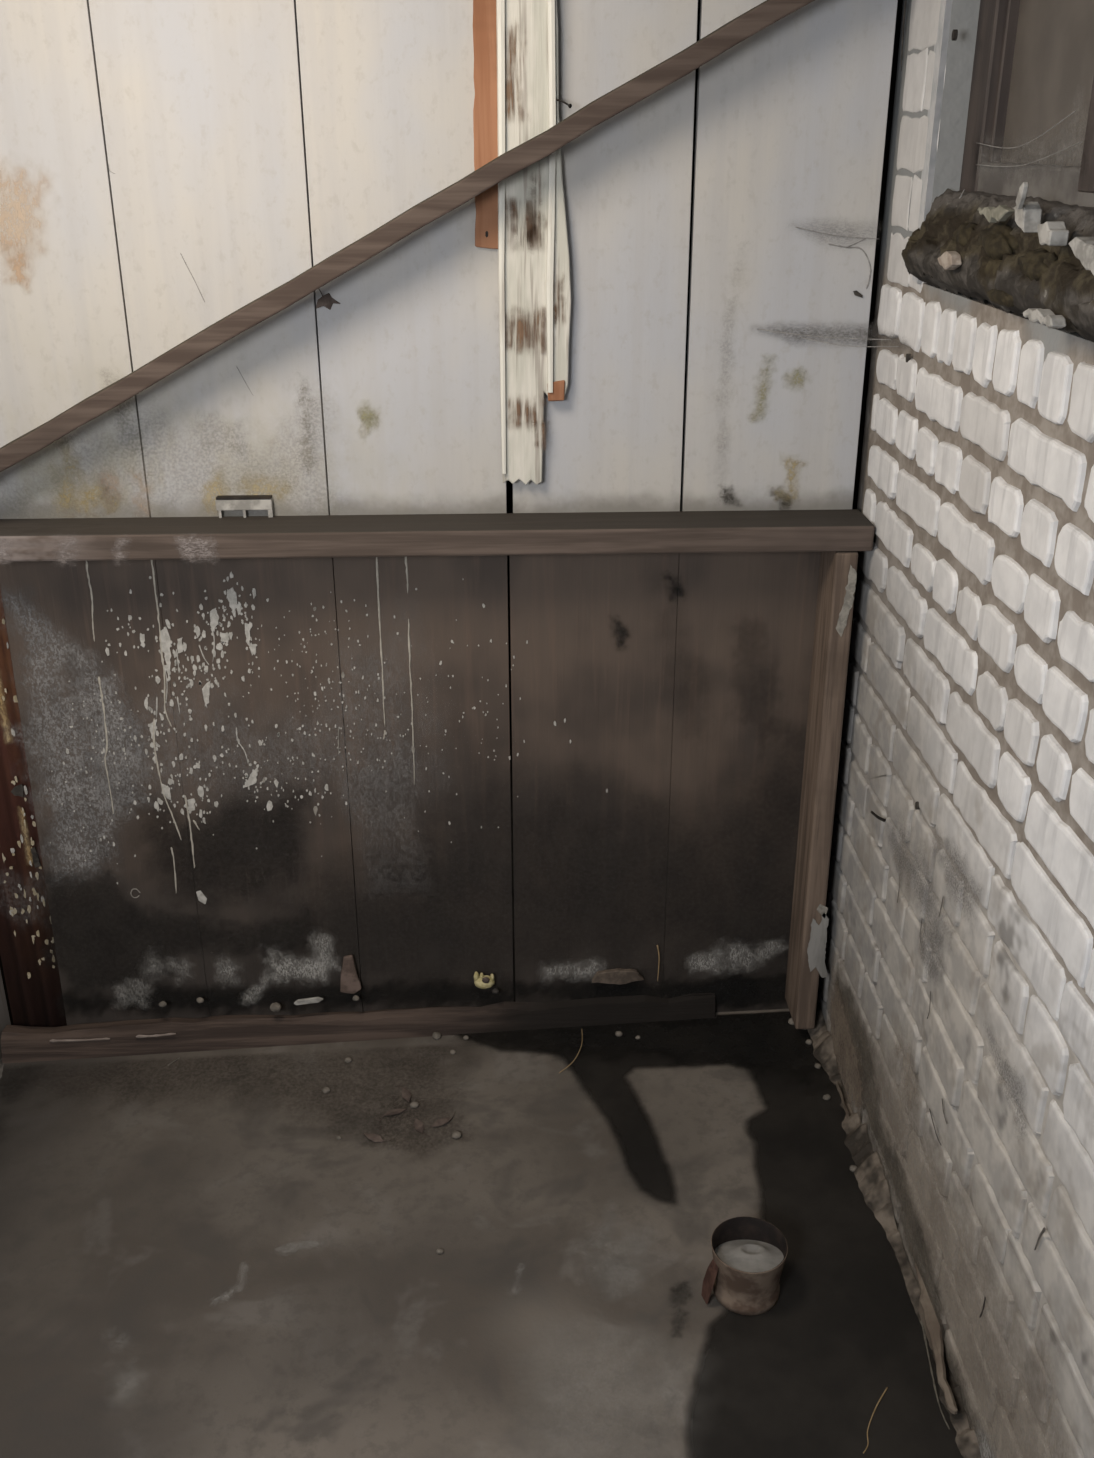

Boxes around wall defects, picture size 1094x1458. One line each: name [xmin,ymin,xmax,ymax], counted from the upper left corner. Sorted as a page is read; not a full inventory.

leakage [5,597,1063,1458]